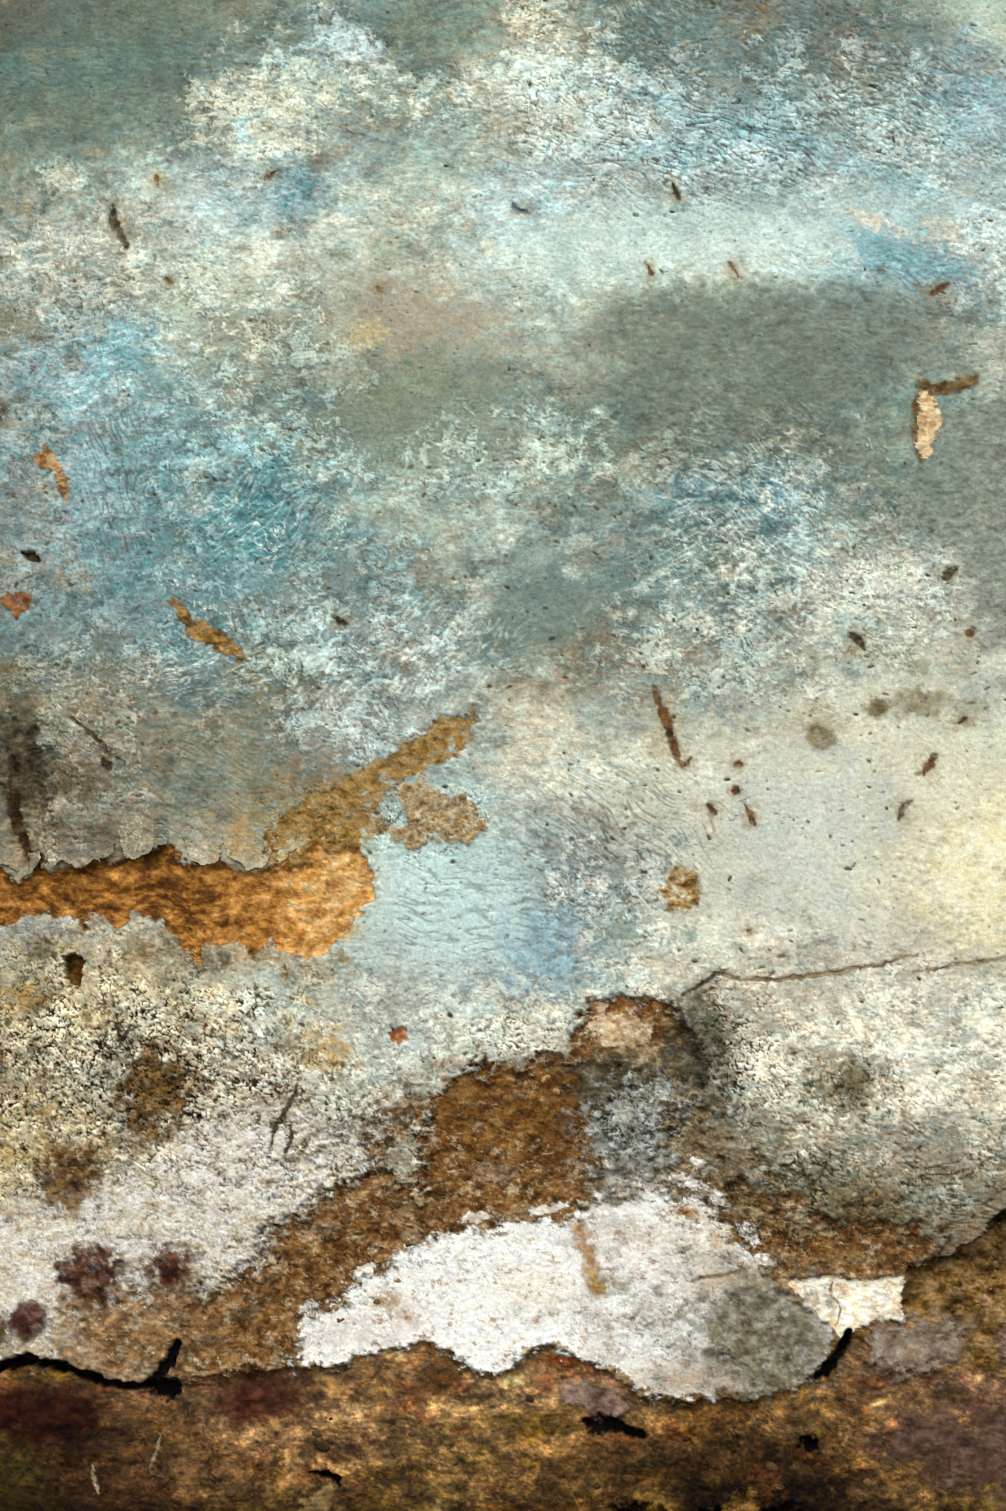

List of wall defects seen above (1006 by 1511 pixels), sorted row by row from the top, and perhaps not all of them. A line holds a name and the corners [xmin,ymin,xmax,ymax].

peeling [34,444,69,504]
peeling [911,374,979,461]
leakage [893,393,1006,647]
peeling [168,597,245,661]
leakage [0,697,107,843]
flaking render [0,706,487,964]
crack [681,954,1006,996]
flaking render [0,995,1006,1511]